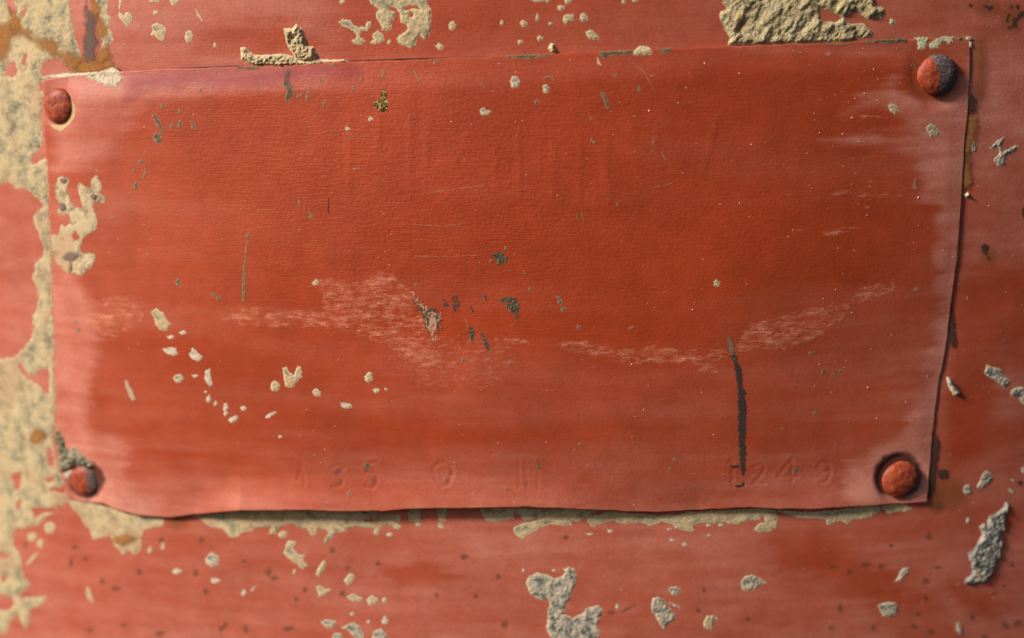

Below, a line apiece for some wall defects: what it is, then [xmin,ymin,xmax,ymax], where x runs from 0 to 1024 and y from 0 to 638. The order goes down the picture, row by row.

rust [0,7,113,73]
peeling [240,24,347,102]
peeling [338,0,443,83]
peeling [719,0,972,55]
rust [962,94,976,187]
peeling [0,0,182,633]
peeling [151,309,246,422]
peeling [270,366,302,391]
peeling [195,509,422,597]
peeling [479,504,913,547]
peeling [963,467,1024,585]
peeling [522,567,619,638]